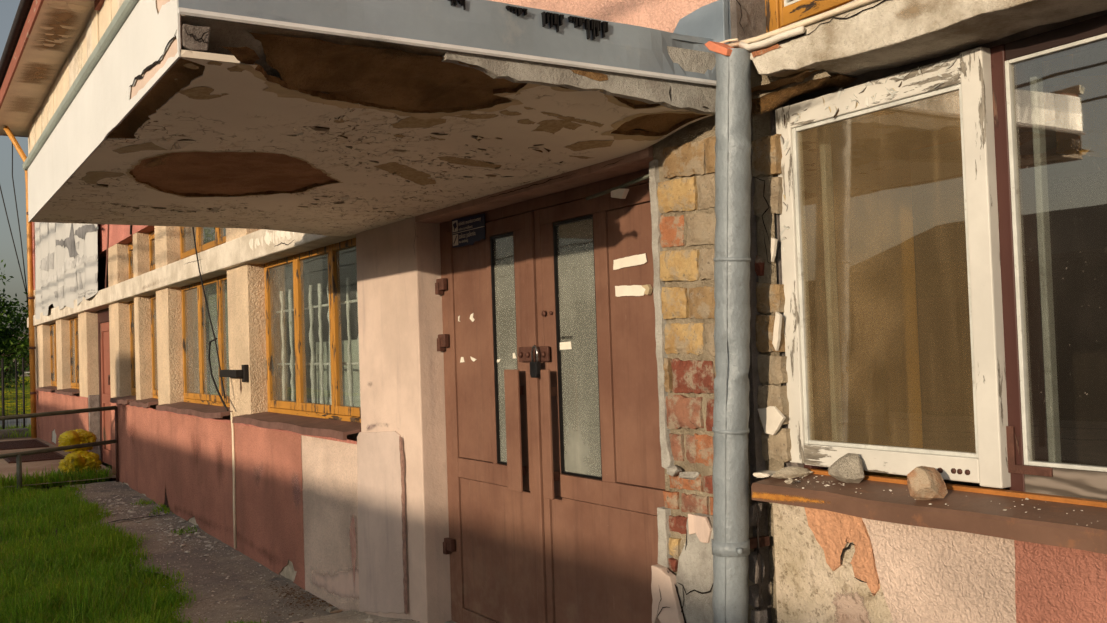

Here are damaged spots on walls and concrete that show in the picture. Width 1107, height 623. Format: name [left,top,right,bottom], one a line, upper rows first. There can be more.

leakage [26,64,50,83]
leakage [37,11,76,50]
crack [129,30,177,87]
peeling [822,55,963,119]
flaking render [82,24,716,623]
flaking render [748,492,893,623]
crack [656,570,713,623]